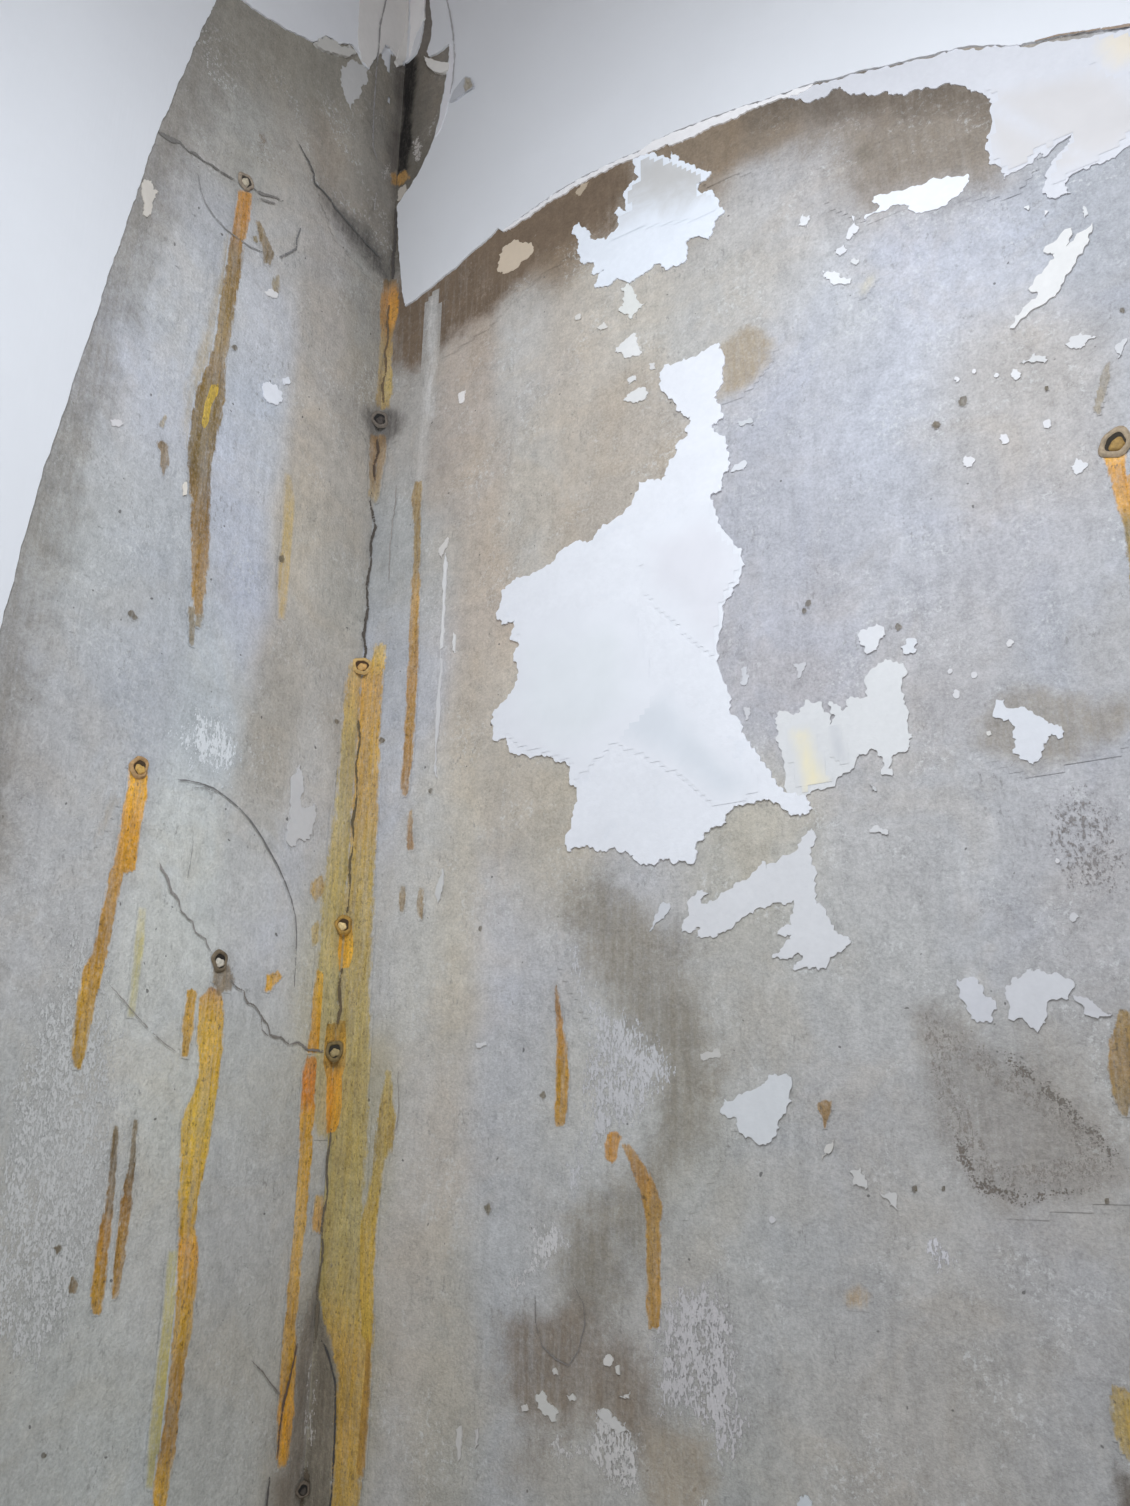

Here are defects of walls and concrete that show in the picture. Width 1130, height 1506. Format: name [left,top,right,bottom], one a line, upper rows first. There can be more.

crack [158,131,397,403]
flaking render [497,239,534,274]
flaking render [503,84,814,232]
damp [317,46,1043,448]
rust [154,189,282,648]
crack [362,439,397,658]
flaking render [1071,458,1088,475]
flaking render [993,699,1064,764]
rust [69,760,150,1070]
crack [159,863,343,1053]
rust [274,641,398,1506]
rust [143,986,226,1506]